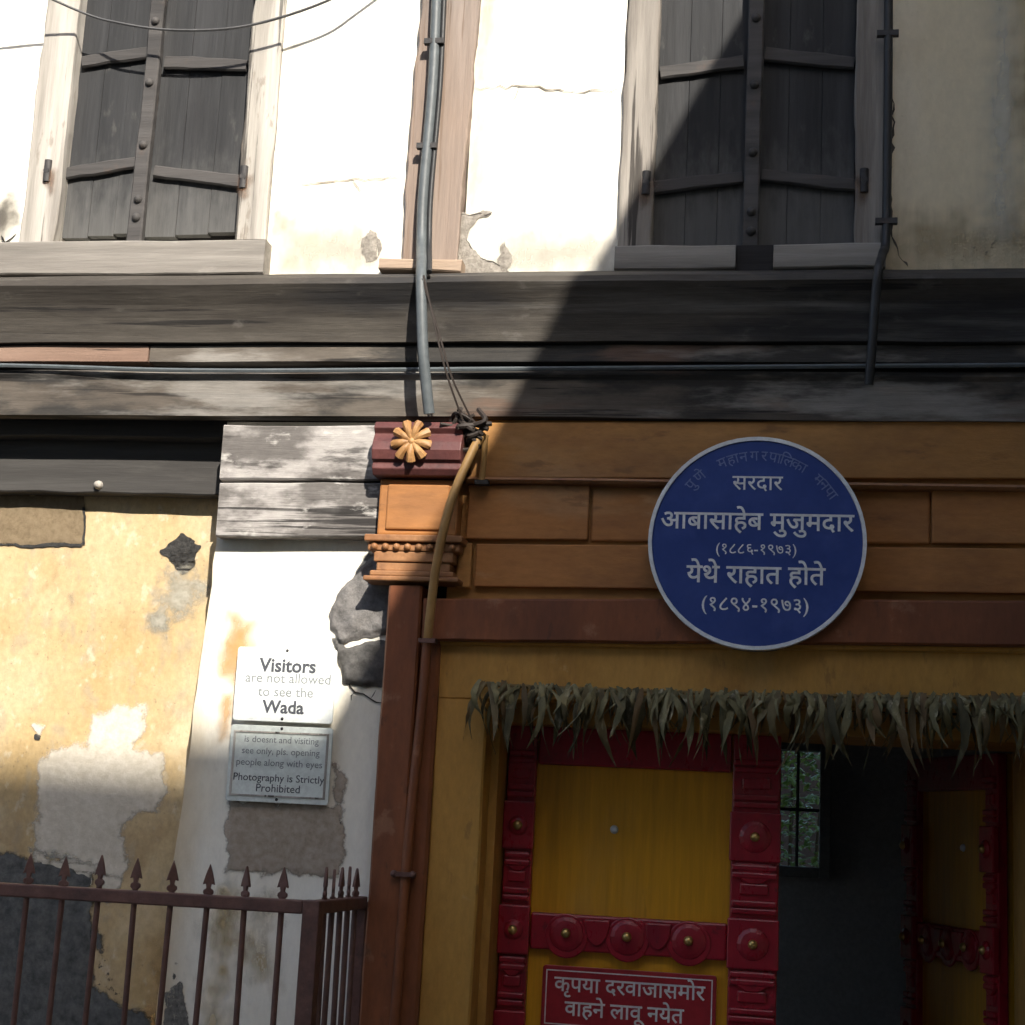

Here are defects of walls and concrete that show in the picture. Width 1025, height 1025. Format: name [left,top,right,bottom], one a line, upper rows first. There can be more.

crack [475,84,621,100]
flaking render [458,210,512,273]
flaking render [160,533,201,574]
water stain [222,619,248,674]
flaking render [329,553,389,688]
peeling [30,704,168,889]